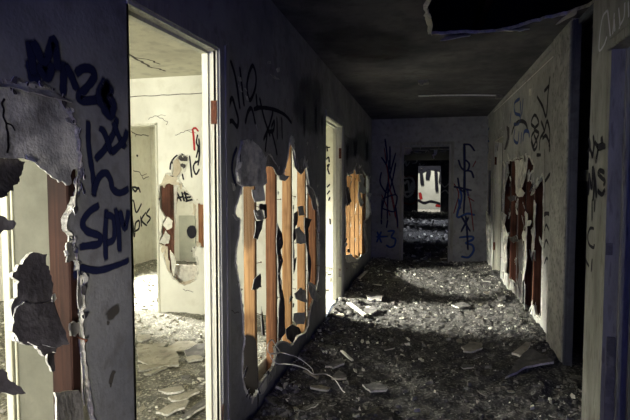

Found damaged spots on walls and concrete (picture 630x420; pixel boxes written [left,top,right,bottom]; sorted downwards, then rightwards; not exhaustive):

crack [129,54,165,71]
spalling [0,76,96,420]
spalling [157,153,204,286]
spalling [232,135,321,404]
spalling [344,163,372,269]
spalling [500,126,544,320]